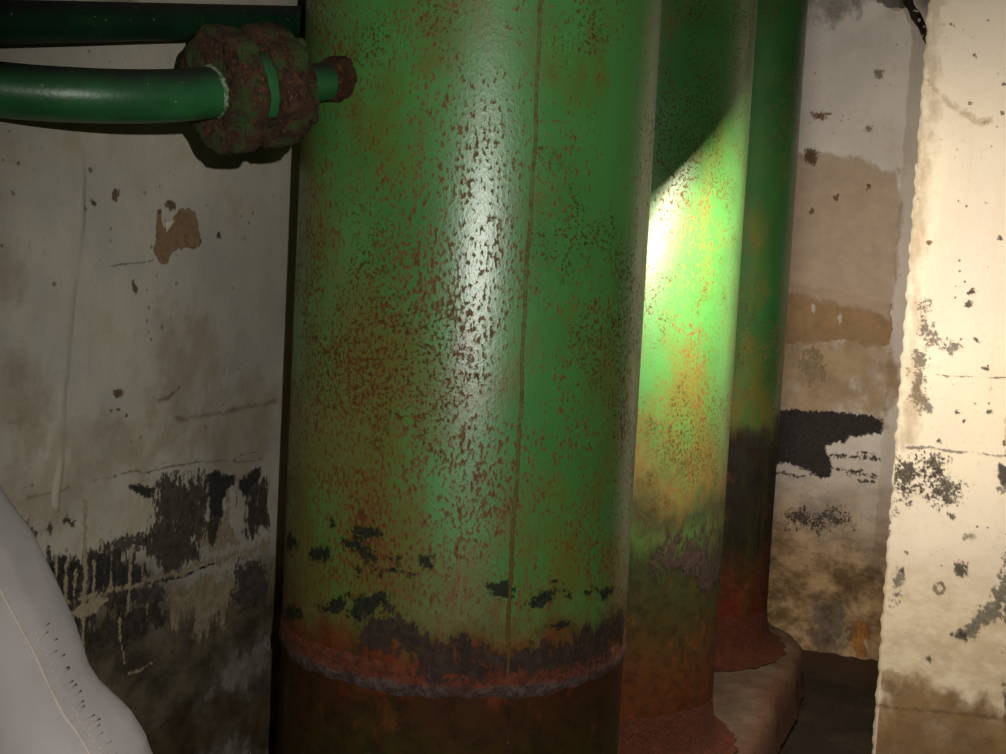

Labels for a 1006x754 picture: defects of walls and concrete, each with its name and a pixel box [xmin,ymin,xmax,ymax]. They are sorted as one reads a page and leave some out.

peeling [154,200,201,264]
corrosion [297,251,480,461]
corrosion [542,194,672,433]
damp [828,451,880,483]
damp [49,490,269,675]
damp [876,678,1006,754]